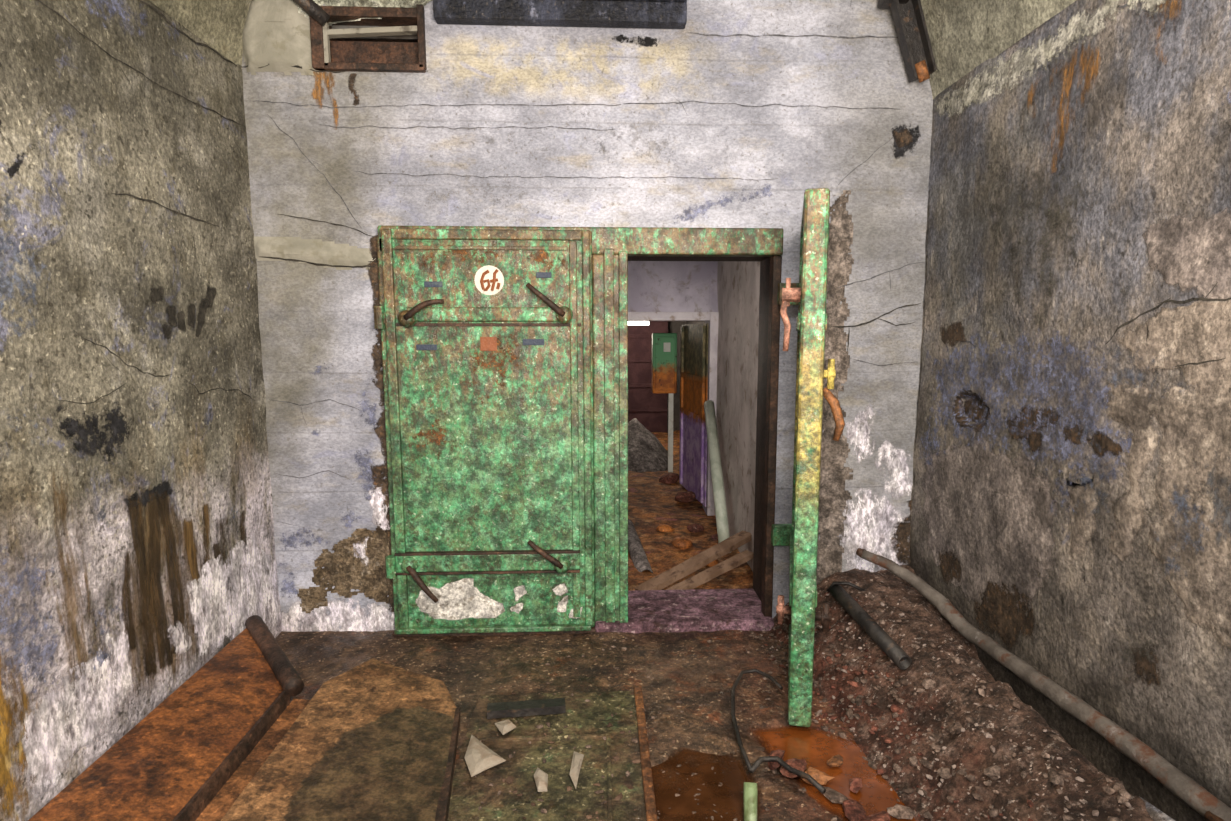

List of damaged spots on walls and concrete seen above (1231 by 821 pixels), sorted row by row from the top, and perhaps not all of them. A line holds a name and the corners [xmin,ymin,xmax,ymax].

corrosion [312,72,339,126]
corrosion [348,73,359,106]
corrosion [1051,48,1100,172]
spalling [280,329,395,625]
spalling [368,235,380,306]
corrosion [460,334,522,419]
spalling [816,190,854,585]
efflorescence [839,406,912,572]
flaking render [919,209,1231,647]
crack [1105,282,1231,345]
crack [1175,358,1226,367]
corrosion [0,656,36,821]